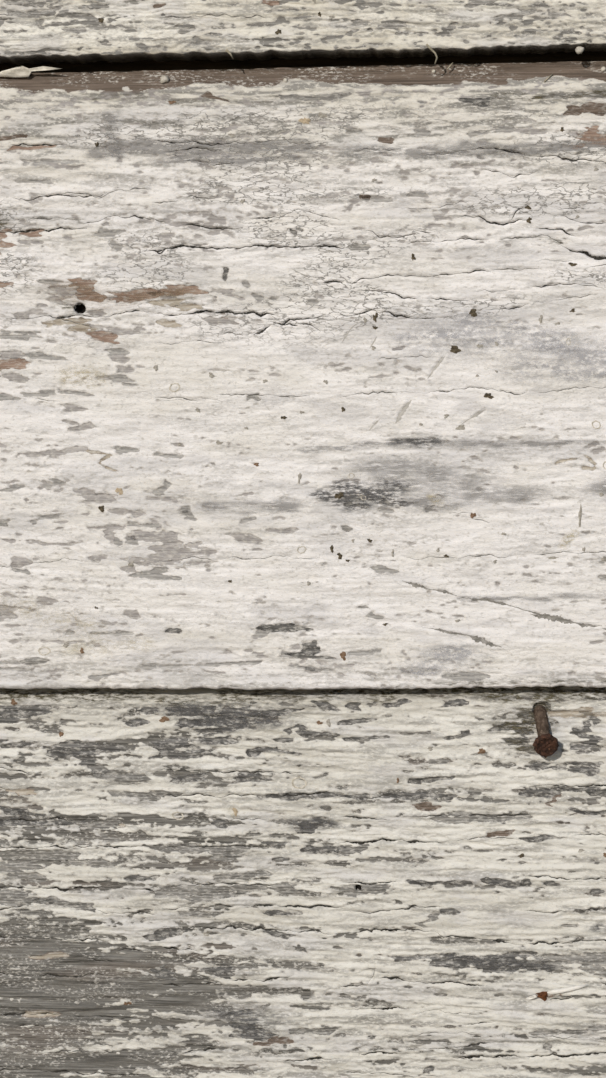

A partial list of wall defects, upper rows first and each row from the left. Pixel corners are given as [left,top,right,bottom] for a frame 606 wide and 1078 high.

crack [154,113,320,166]
crack [421,147,605,178]
crack [0,188,340,254]
crack [13,199,606,345]
peeling [0,267,279,431]
peeling [43,478,217,580]
peeling [255,623,334,672]
peeling [0,739,208,801]
peeling [125,701,431,759]
peeling [489,701,606,807]
peeling [232,772,563,843]
peeling [390,951,606,977]